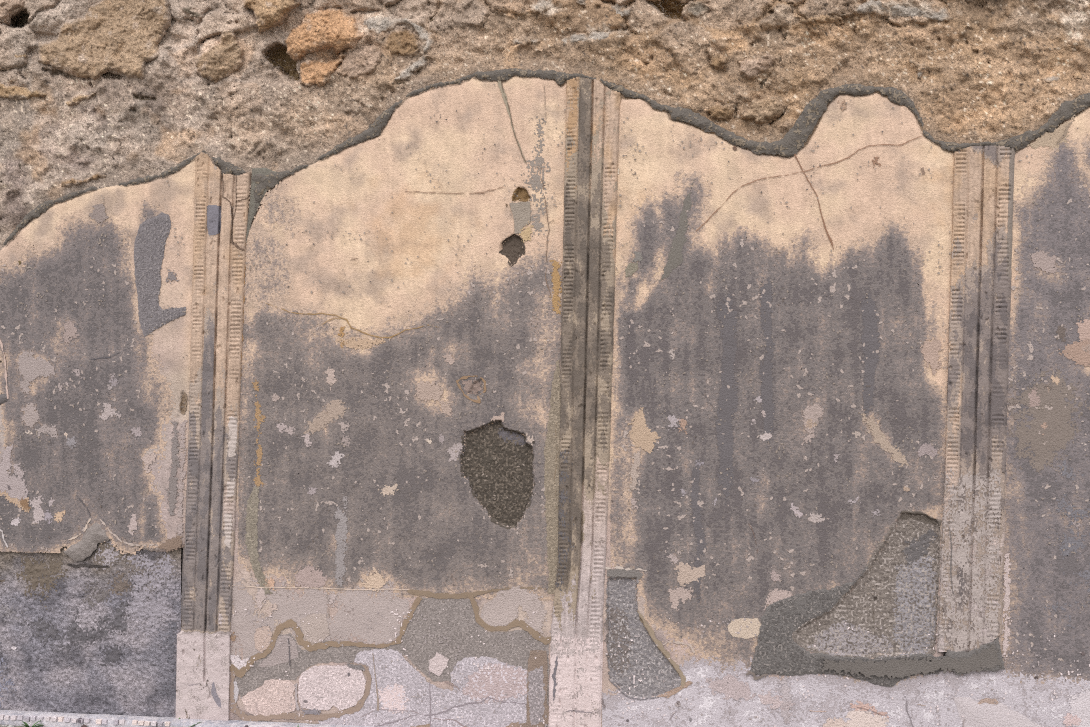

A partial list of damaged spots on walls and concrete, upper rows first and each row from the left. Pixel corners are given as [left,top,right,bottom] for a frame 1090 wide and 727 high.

damp [135,197,167,226]
spalling [499,234,525,266]
spalling [512,186,530,202]
crack [498,80,553,295]
crack [696,136,922,249]
peeling [0,340,85,449]
damp [0,204,179,656]
spalling [426,412,535,529]
damp [99,644,125,668]
spalling [230,565,528,727]
peeling [480,465,1090,727]
damp [823,709,889,727]